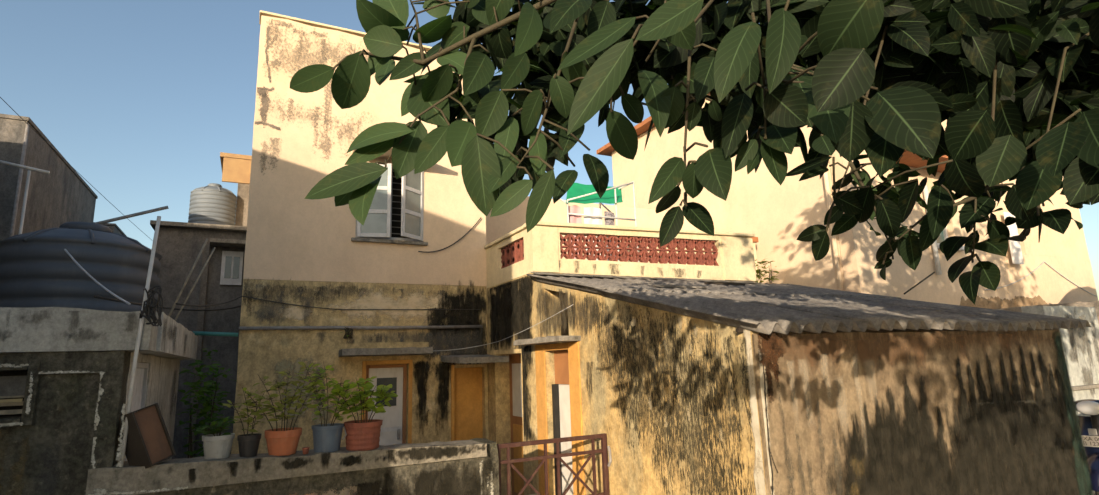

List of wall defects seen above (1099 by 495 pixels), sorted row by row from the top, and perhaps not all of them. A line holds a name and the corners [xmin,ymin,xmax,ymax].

leakage [261,20,370,157]
leakage [260,138,279,172]
leakage [243,280,373,322]
leakage [368,276,755,495]
peeling [87,486,188,495]
flaking render [292,485,357,495]
leakage [282,444,496,495]